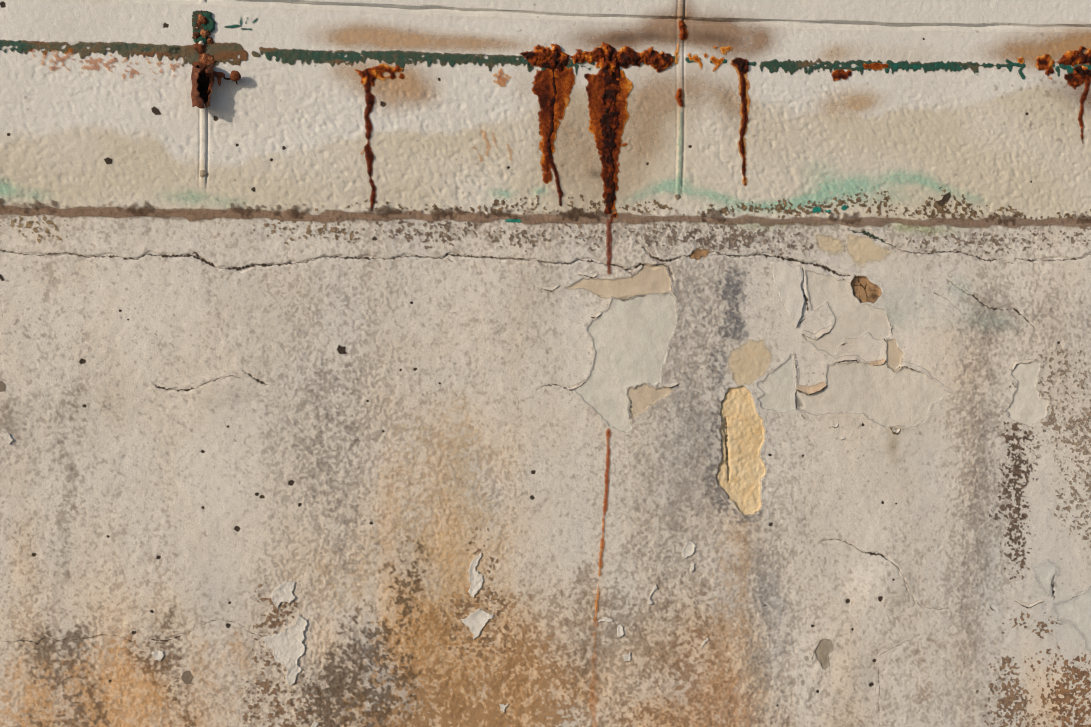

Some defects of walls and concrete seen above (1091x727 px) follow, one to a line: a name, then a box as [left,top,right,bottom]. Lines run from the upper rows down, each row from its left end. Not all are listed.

rust [355,63,404,210]
rust [520,20,750,274]
rust [1017,46,1091,144]
crack [0,248,690,275]
crack [717,254,850,311]
crack [850,230,1091,264]
peeling [253,187,1091,515]
rust [594,428,610,621]
crack [830,539,941,610]
damp [22,625,174,727]
damp [302,543,576,727]